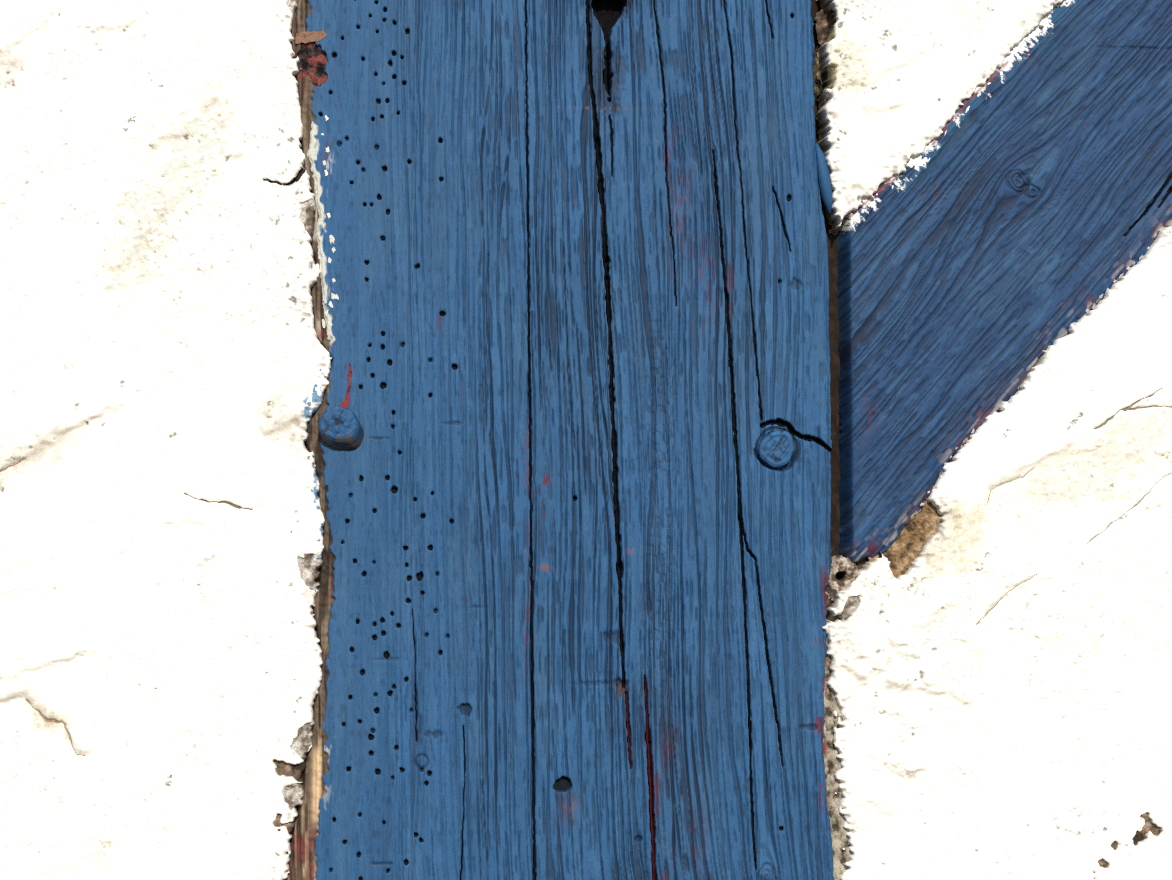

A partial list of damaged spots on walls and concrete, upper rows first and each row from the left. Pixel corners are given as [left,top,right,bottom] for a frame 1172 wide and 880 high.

crack [1124,172,1172,236]
peeling [1085,226,1165,313]
crack [586,0,656,880]
crack [713,0,832,870]
spalling [868,428,975,578]
crack [26,699,85,756]
spalling [1132,813,1161,846]